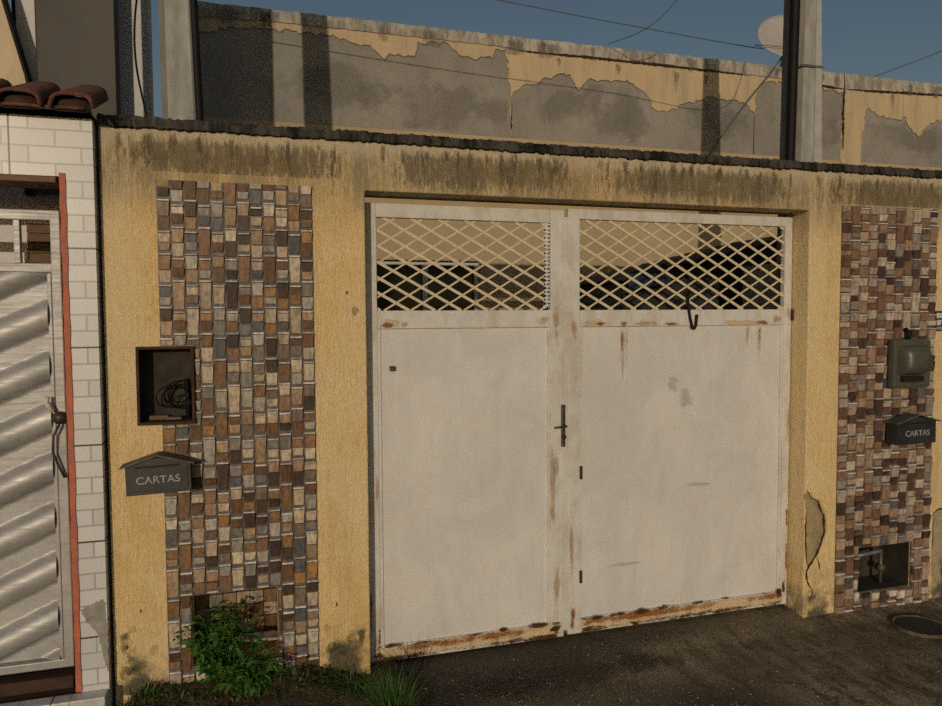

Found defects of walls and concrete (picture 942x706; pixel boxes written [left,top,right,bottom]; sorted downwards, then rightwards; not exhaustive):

flaking render [199,26,782,156]
flaking render [822,86,844,160]
flaking render [861,108,942,168]
flaking render [805,489,827,598]
spalling [80,599,109,671]
water stain [122,634,153,695]
water stain [328,630,365,675]
corrosion [370,581,785,661]